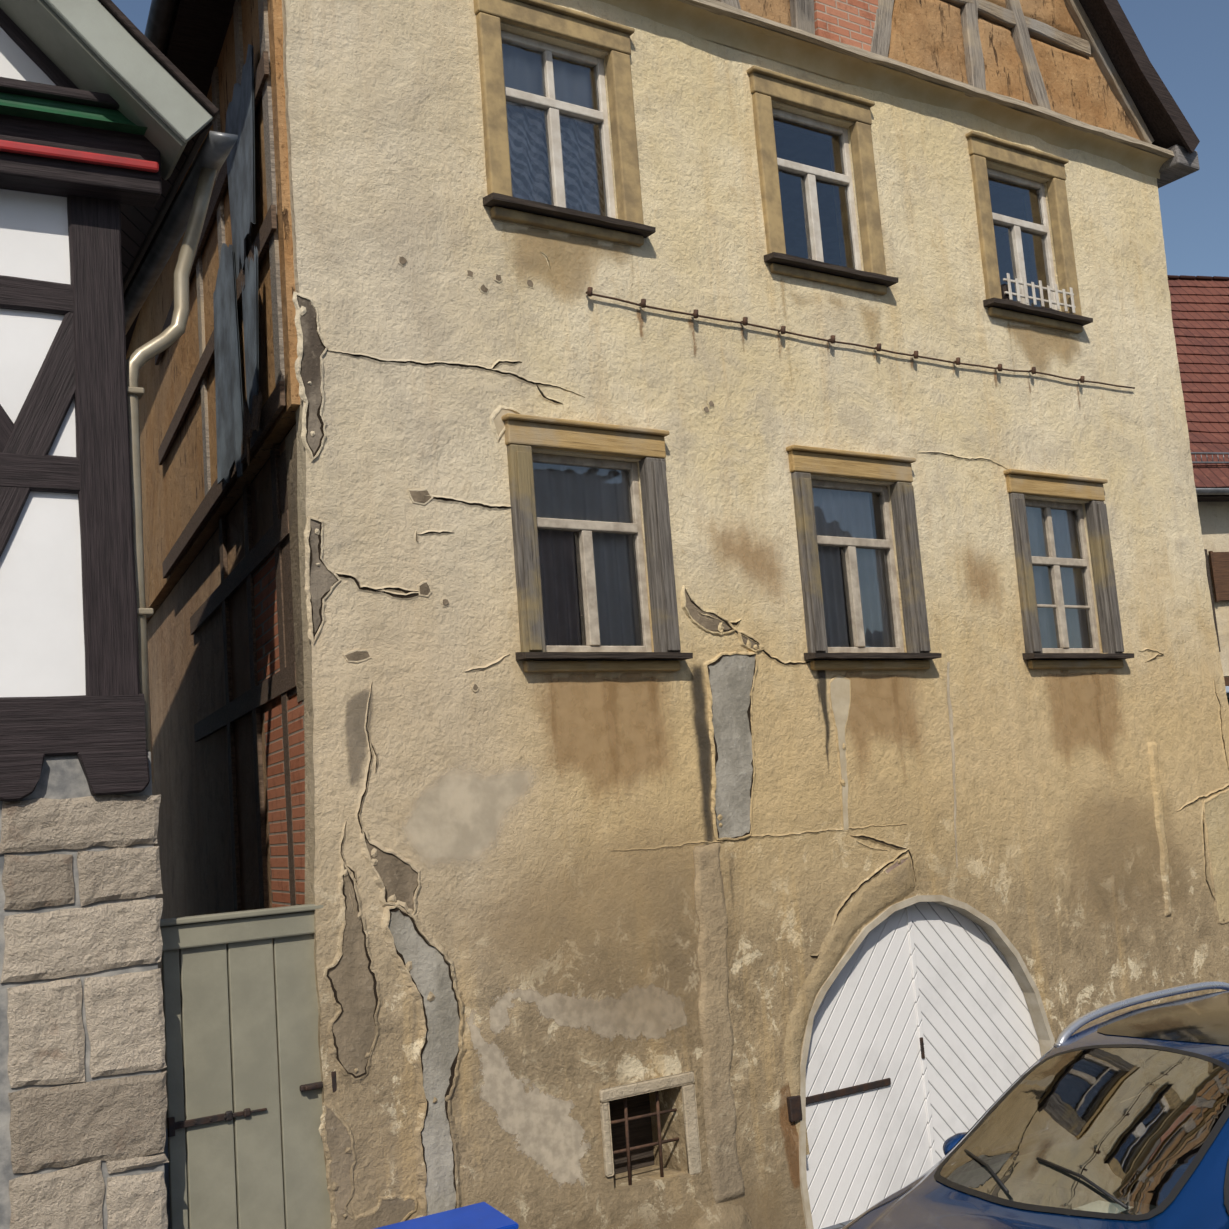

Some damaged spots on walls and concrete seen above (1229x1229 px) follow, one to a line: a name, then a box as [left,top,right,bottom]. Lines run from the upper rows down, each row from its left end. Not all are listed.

flaking render [292,292,328,462]
crack [327,350,585,405]
flaking render [303,516,342,645]
crack [335,572,420,600]
water stain [551,673,662,782]
flaking render [681,585,765,842]
flaking render [829,675,851,831]
crack [611,824,917,960]
flaking render [318,826,467,1229]